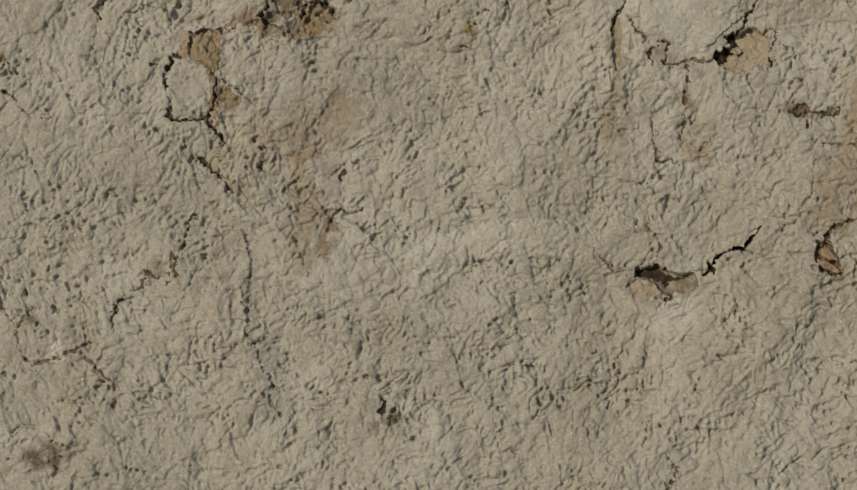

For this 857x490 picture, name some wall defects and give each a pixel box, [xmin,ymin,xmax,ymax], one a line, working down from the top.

crack [627,16,713,83]
flaking render [150,0,339,210]
crack [789,106,857,199]
crack [586,244,637,274]
crack [634,220,663,257]
crack [702,225,761,276]
crack [825,217,856,237]